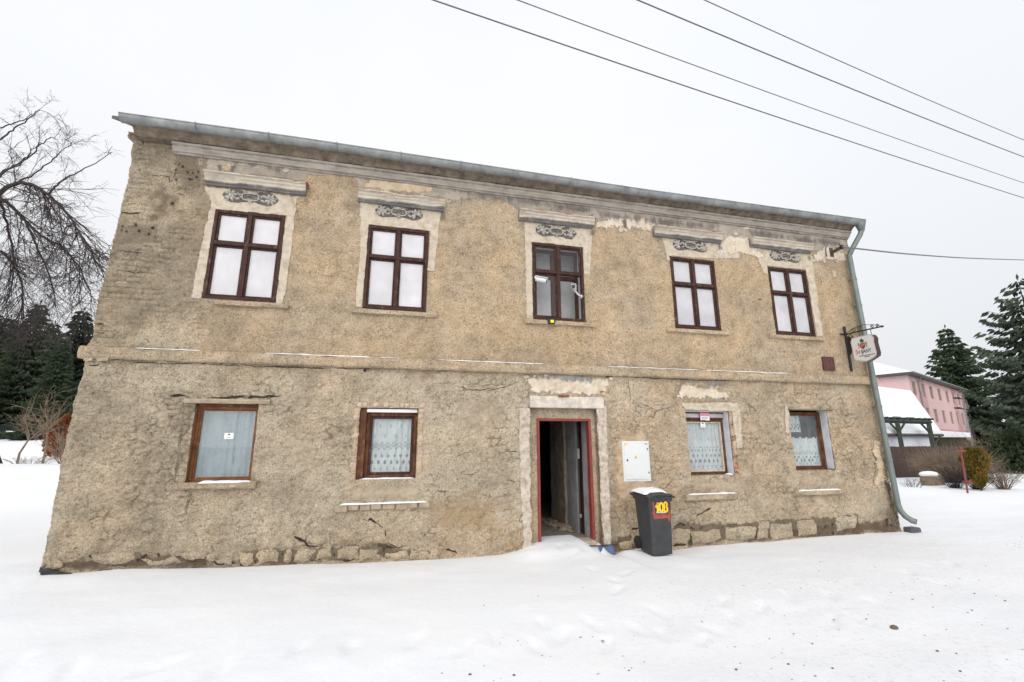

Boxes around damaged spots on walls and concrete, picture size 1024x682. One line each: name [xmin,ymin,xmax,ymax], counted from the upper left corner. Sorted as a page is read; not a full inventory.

peeling [595,217,655,232]
peeling [715,227,765,260]
peeling [811,246,847,277]
crack [89,359,365,369]
peeling [523,374,613,396]
peeling [677,383,729,399]
crack [171,394,281,486]
crack [157,536,355,566]